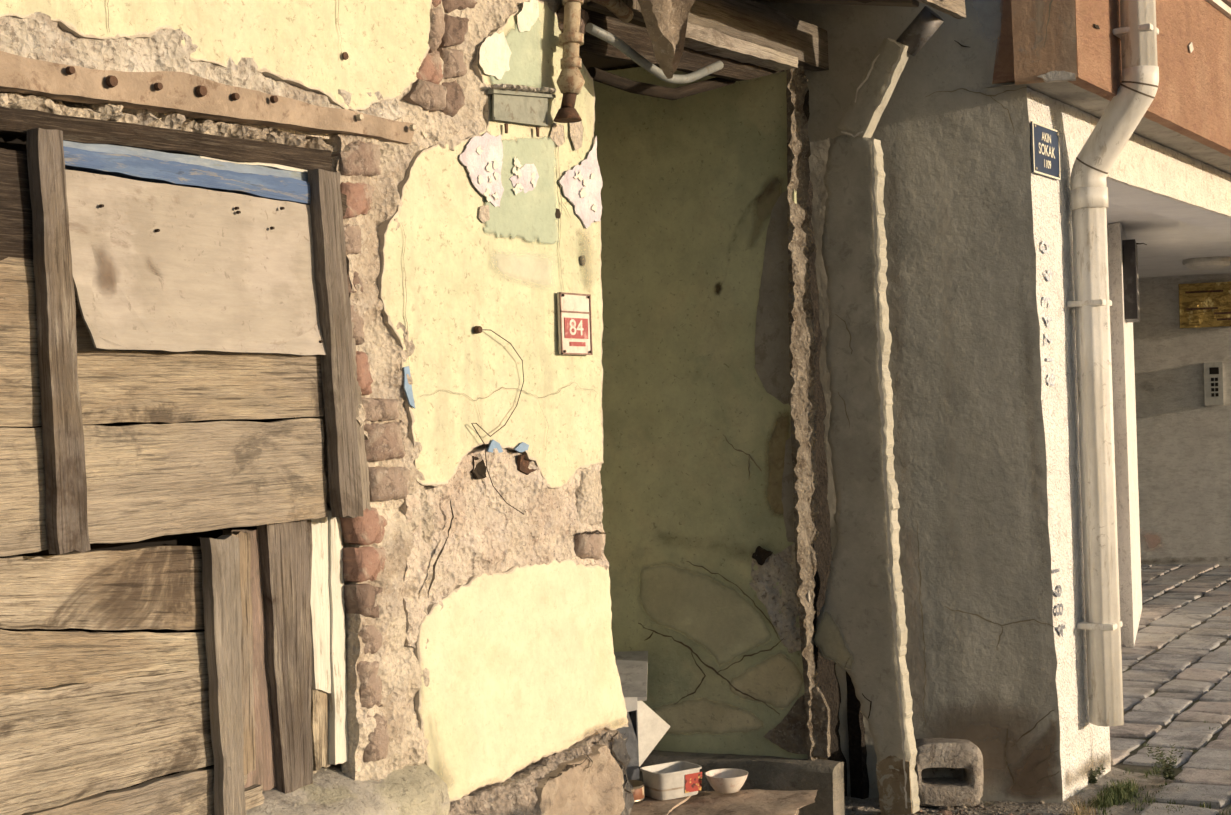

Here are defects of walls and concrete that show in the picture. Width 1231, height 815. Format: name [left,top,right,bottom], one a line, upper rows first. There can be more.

spalling [0,0,609,781]
crack [428,500,454,598]
spalling [749,65,853,796]
crack [916,521,1056,727]